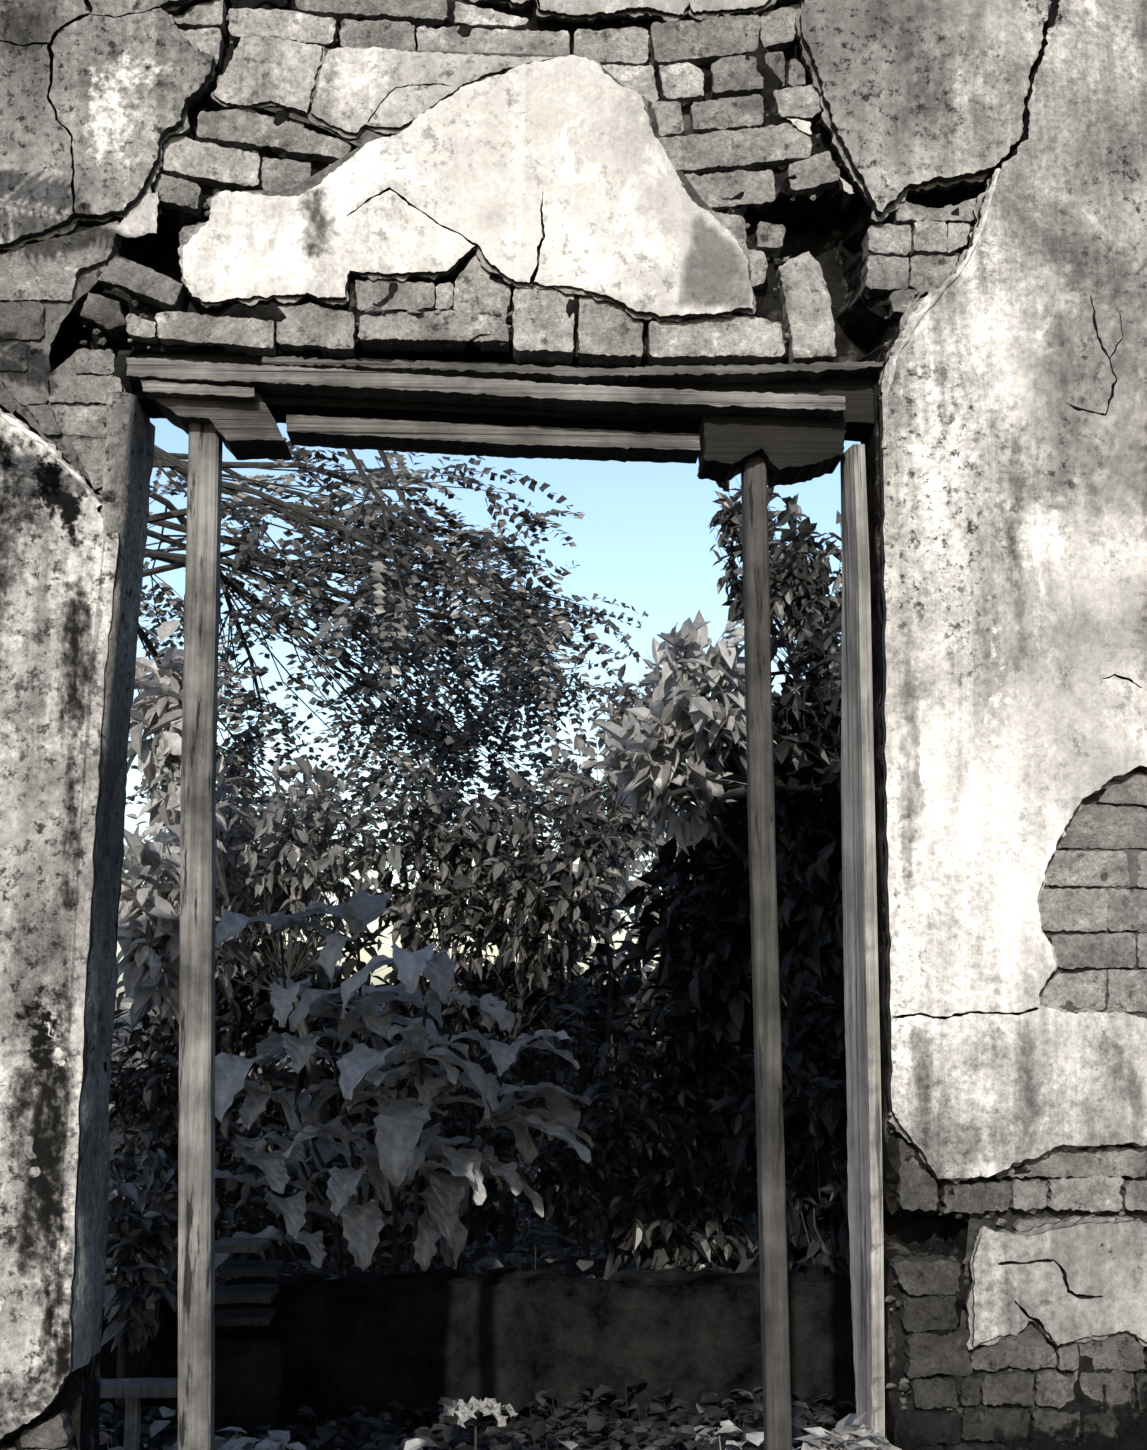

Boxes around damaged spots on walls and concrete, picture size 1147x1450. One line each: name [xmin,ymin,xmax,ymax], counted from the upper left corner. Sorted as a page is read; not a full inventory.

crack [0,0,163,218]
crack [346,188,478,248]
spalling [0,0,854,509]
crack [530,195,545,287]
spalling [859,168,1001,448]
crack [991,0,1060,177]
water stain [0,436,95,608]
water stain [58,581,95,908]
spalling [1039,768,1147,1020]
spalling [884,1123,1147,1450]
crack [1014,1300,1051,1340]
crack [998,1259,1103,1299]